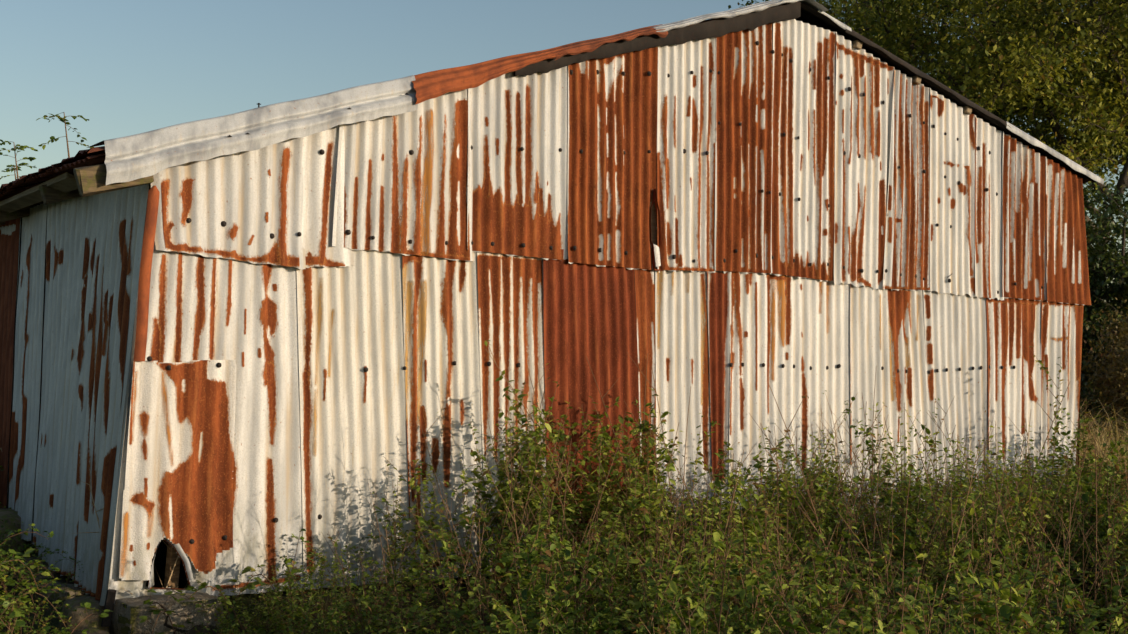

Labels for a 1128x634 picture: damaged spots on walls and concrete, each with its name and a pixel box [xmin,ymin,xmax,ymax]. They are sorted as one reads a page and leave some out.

rust [9,235,32,510]
rust [46,240,64,281]
rust [56,219,149,602]
rust [130,23,1091,591]